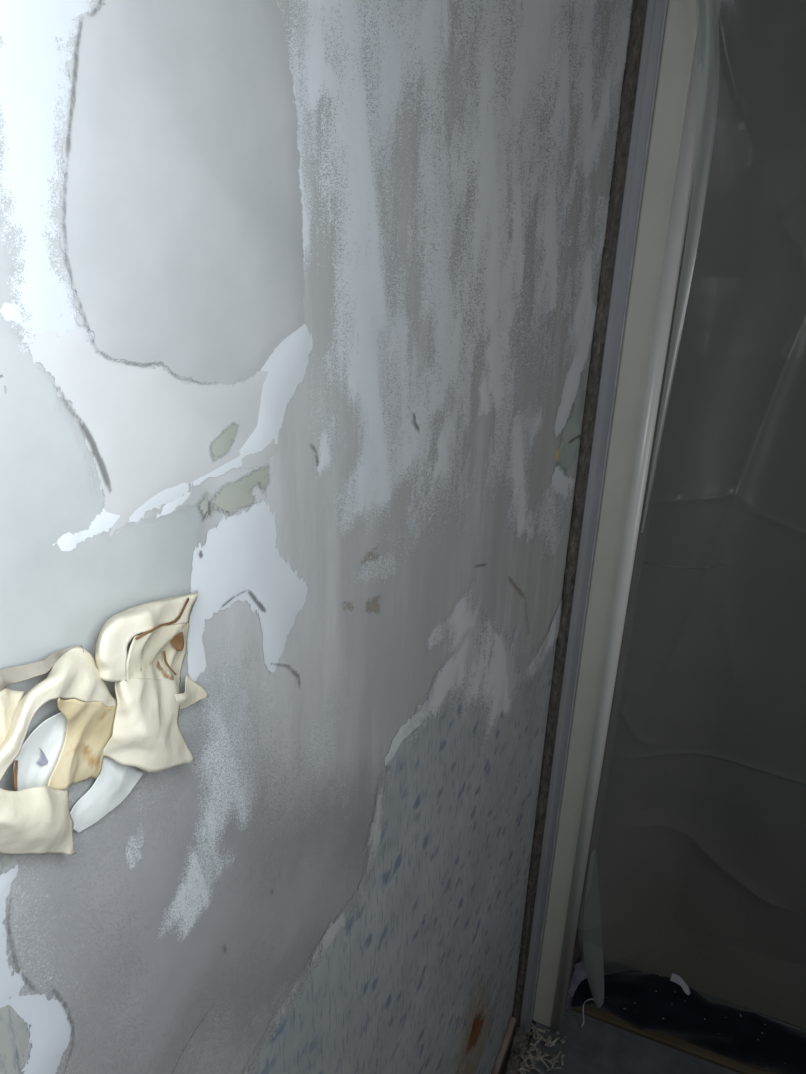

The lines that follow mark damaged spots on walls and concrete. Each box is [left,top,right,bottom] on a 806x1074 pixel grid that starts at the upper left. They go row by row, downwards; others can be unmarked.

crack [64,0,101,233]
flaking render [0,142,307,942]